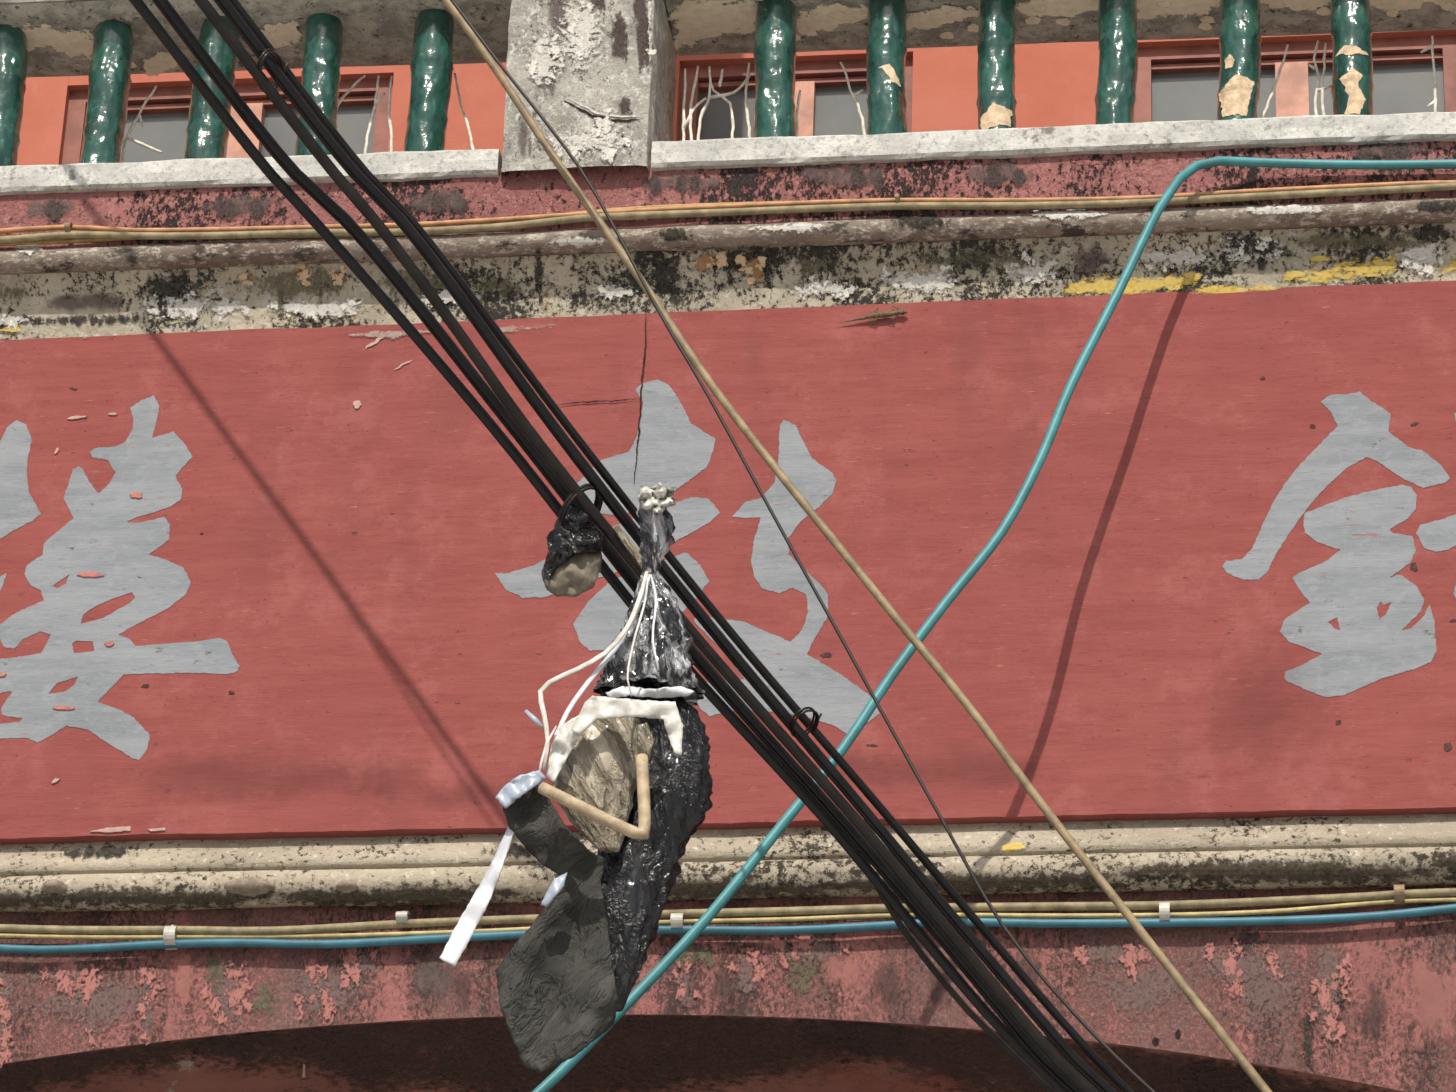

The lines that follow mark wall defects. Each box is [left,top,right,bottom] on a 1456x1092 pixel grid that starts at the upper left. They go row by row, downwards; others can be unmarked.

flaking render [1137,0,1221,30]
peeling [980,102,1013,129]
peeling [1218,54,1255,117]
peeling [1335,45,1368,115]
water stain [713,223,836,288]
water stain [1031,208,1108,220]
water stain [1217,198,1456,270]
water stain [0,266,203,327]
water stain [0,881,541,913]
water stain [926,855,1456,900]
spalling [0,959,165,1068]
peeling [1059,934,1356,1055]